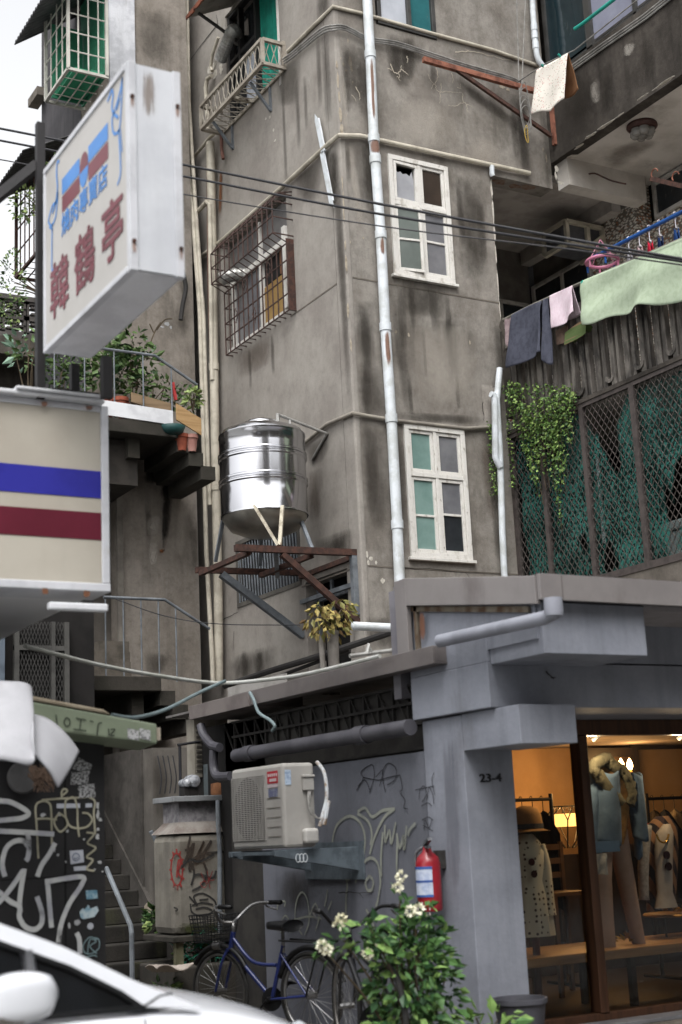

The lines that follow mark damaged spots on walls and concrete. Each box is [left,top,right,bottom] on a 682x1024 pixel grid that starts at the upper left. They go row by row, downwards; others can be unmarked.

crack [388,51,513,111]